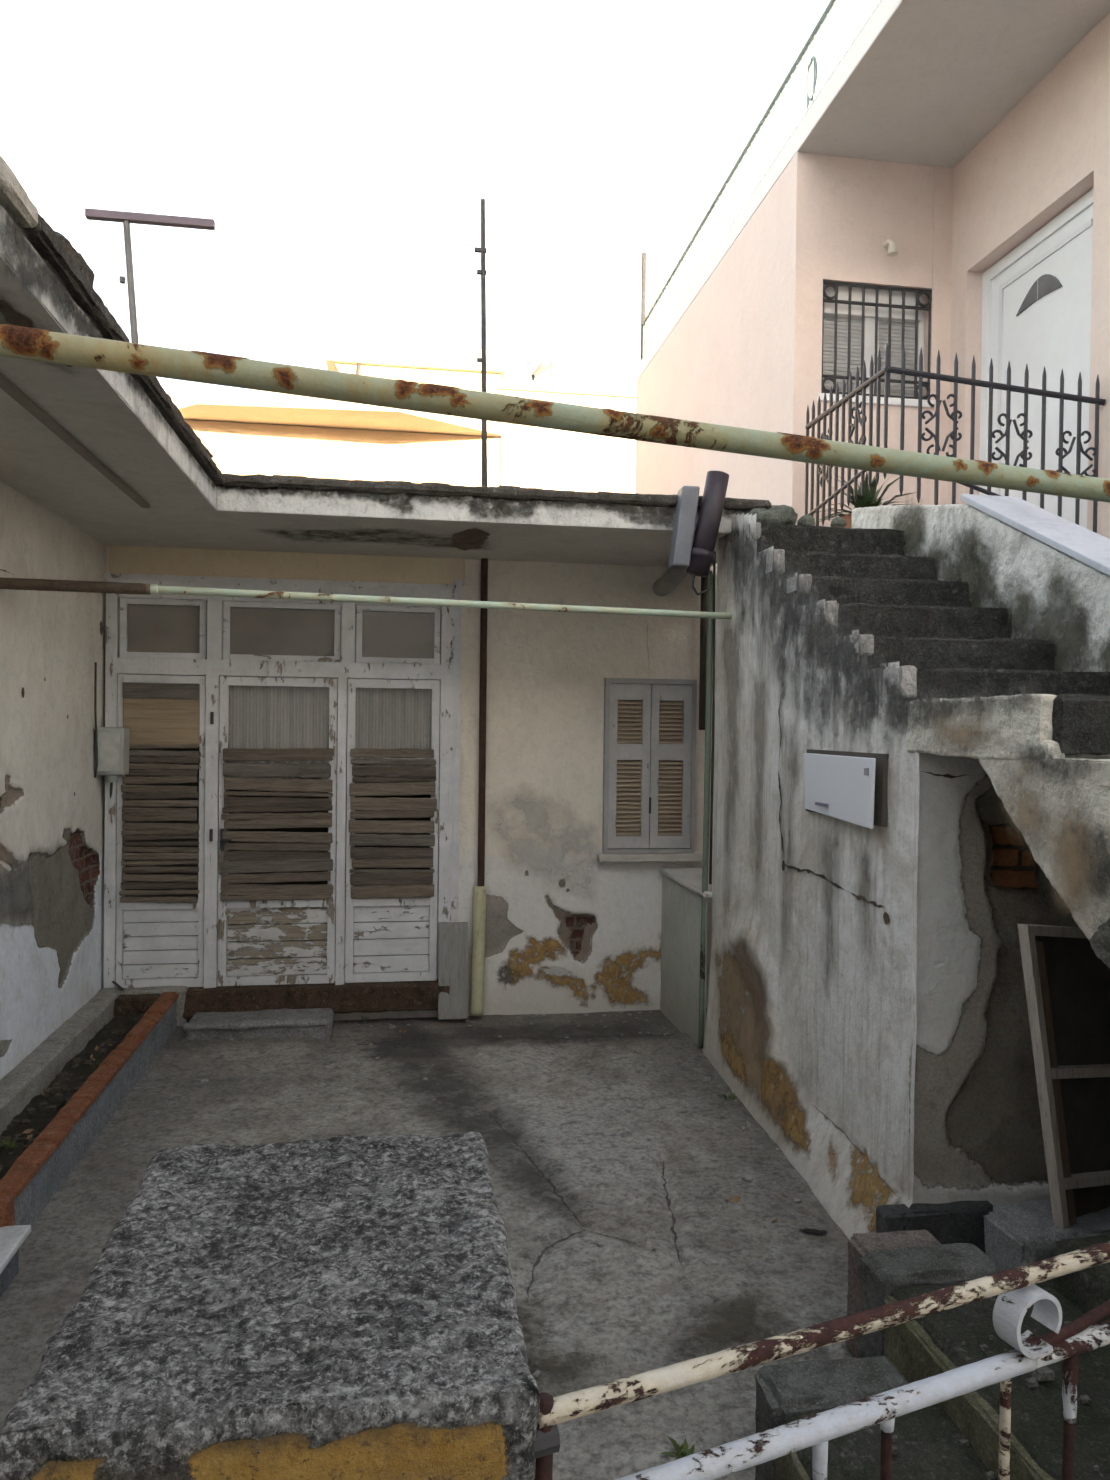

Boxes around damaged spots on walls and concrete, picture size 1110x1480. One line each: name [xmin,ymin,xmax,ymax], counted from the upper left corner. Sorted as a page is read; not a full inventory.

water stain [0,208,102,338]
water stain [125,373,676,527]
water stain [722,509,1037,865]
crack [778,696,890,925]
water stain [1010,747,1110,902]
flaking render [0,828,100,988]
peeling [485,894,523,957]
flaking render [545,879,598,963]
flaking render [909,775,1079,1190]
crack [486,1111,639,1303]
crack [662,1161,683,1267]
peeling [31,1421,509,1480]